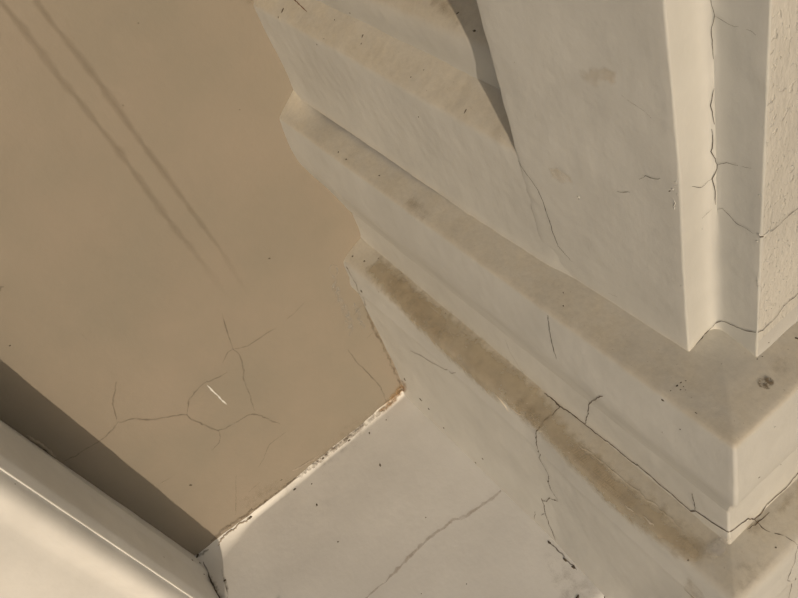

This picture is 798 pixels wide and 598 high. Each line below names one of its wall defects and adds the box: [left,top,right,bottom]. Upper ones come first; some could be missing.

crack [692,90,751,232]
crack [696,296,796,345]
crack [534,393,798,595]